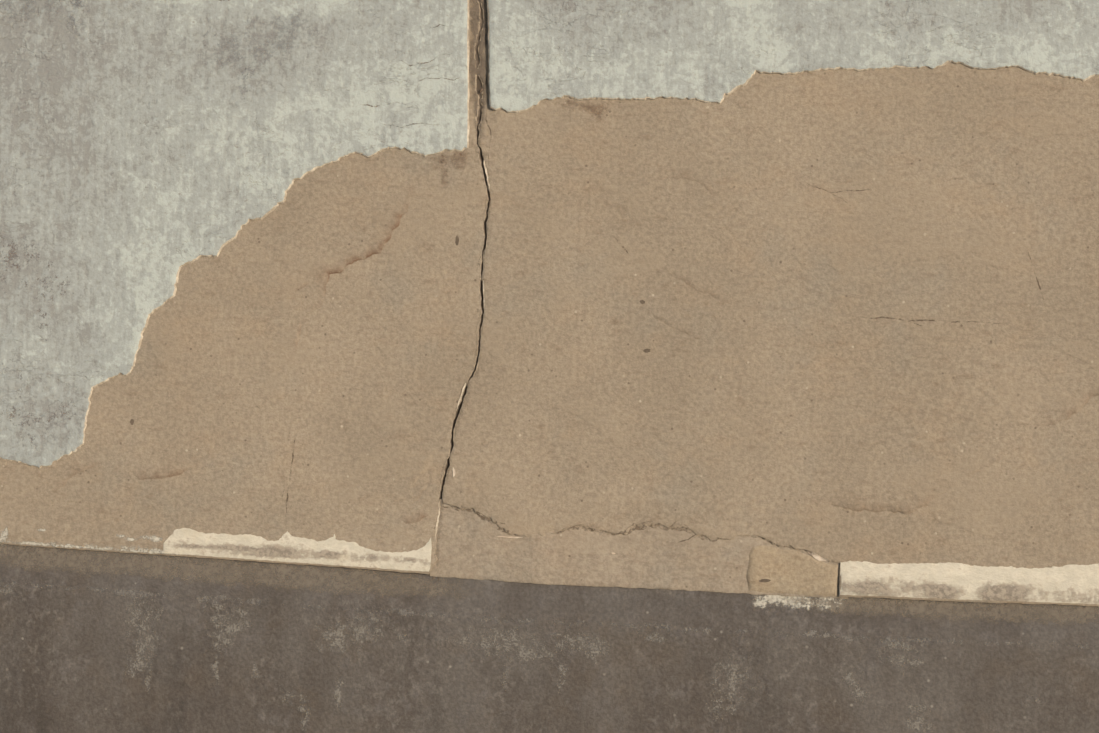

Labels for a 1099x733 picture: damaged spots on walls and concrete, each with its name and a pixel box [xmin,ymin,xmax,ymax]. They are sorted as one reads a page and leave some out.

peeling [0,0,489,574]
crack [558,523,731,542]
peeling [430,0,1099,606]